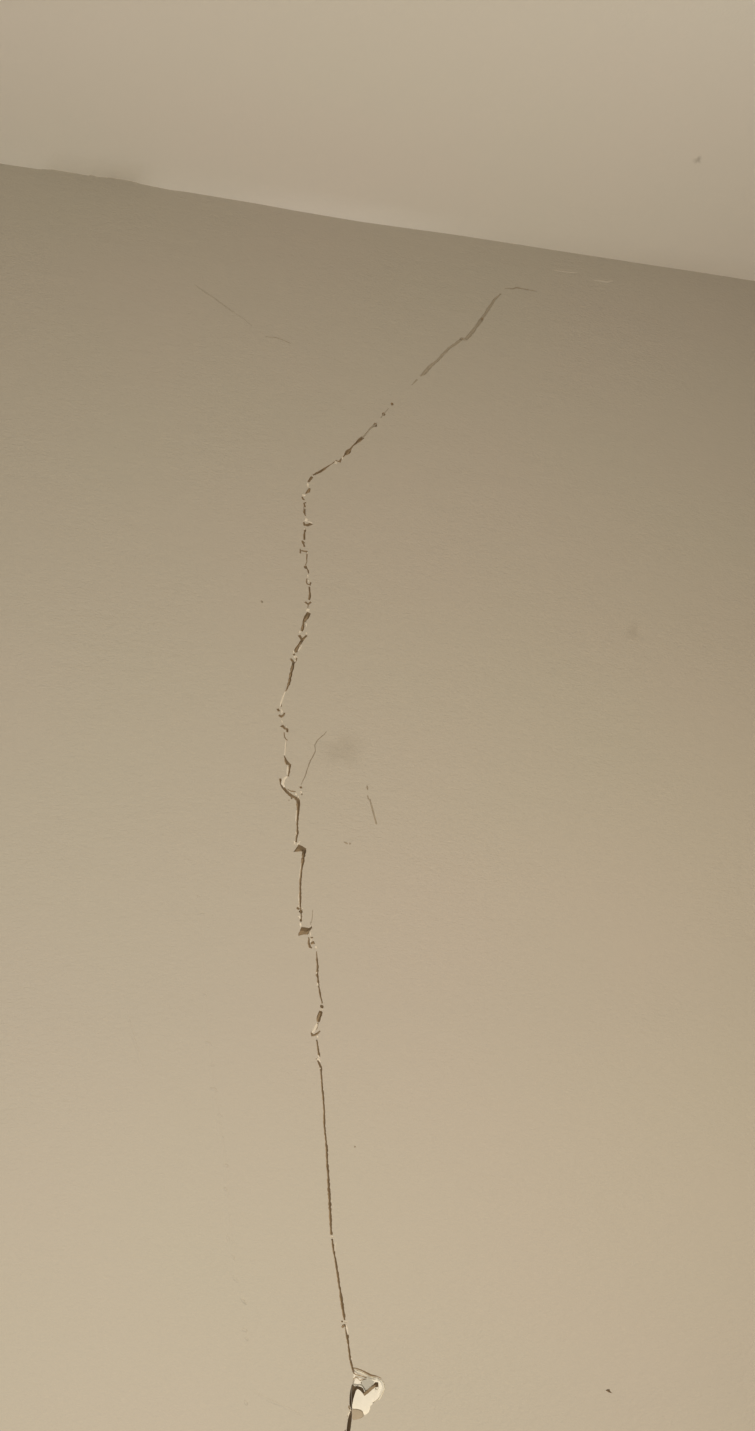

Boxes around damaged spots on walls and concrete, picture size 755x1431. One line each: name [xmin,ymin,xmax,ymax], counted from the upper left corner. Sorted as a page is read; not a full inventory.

flaking render [351,1367,385,1420]
crack [277,287,535,1431]